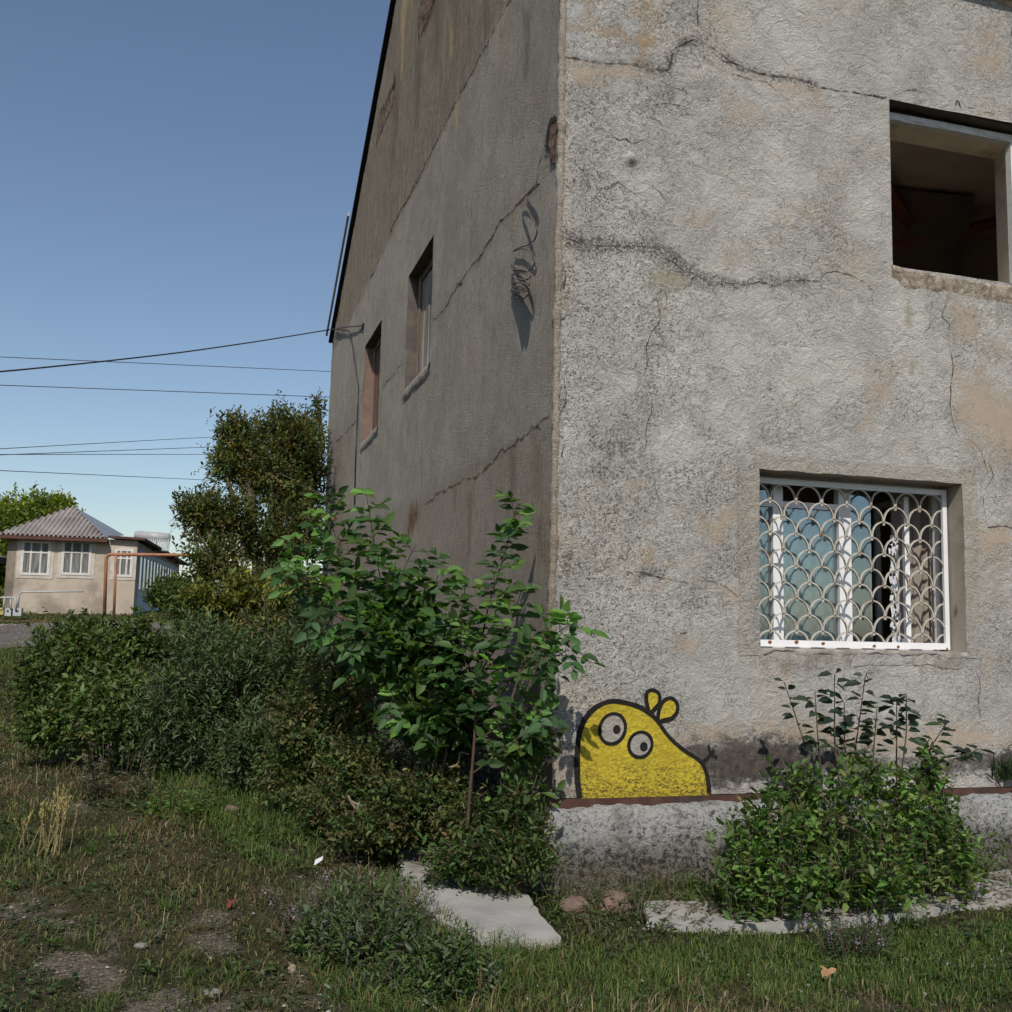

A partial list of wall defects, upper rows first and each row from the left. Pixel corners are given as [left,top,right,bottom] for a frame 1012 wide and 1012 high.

flaking render [418,0,435,42]
crack [390,0,510,232]
flaking render [544,115,557,163]
crack [565,3,923,144]
crack [433,148,546,319]
crack [566,234,873,460]
crack [421,415,549,505]
leakage [676,722,1012,790]